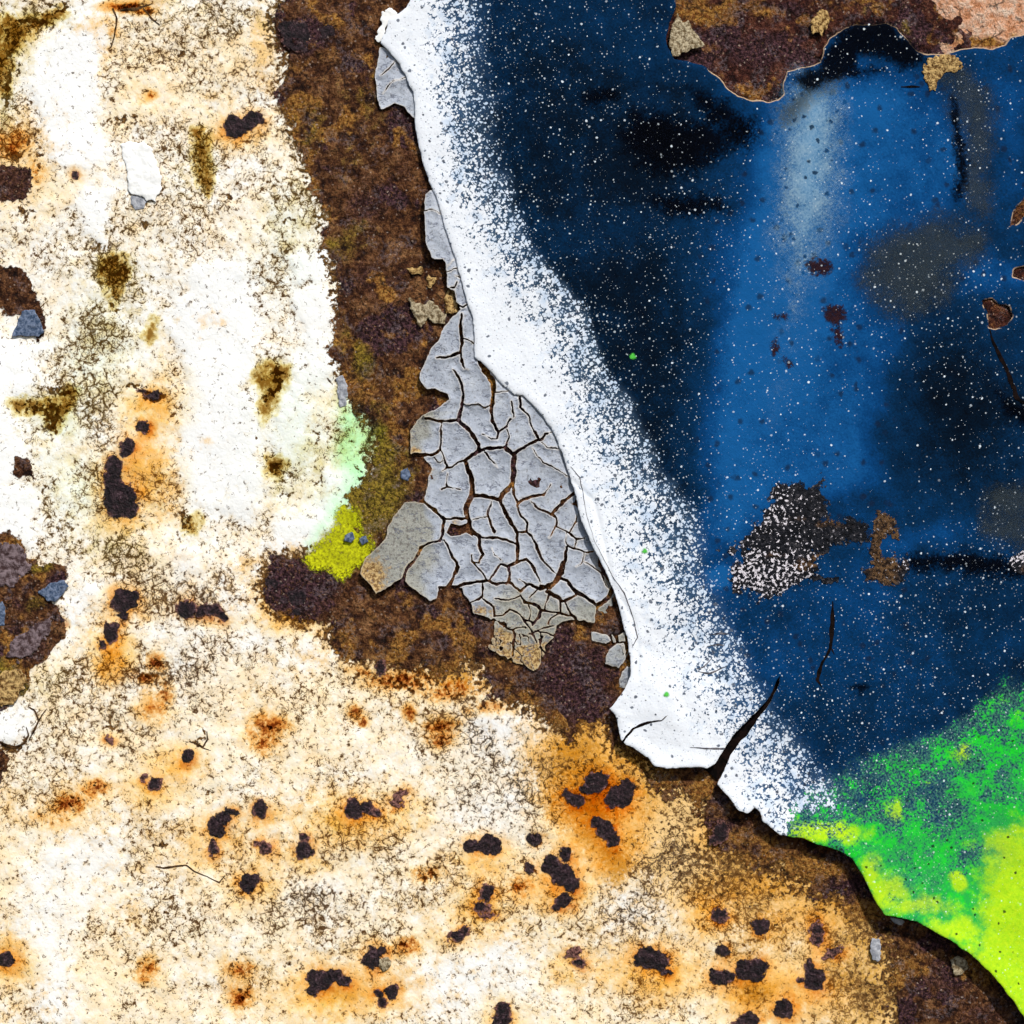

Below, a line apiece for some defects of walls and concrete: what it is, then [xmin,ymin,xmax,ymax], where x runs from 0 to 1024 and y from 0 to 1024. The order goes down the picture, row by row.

peeling [375,8,415,119]
peeling [669,13,704,57]
rust [103,420,151,519]
peeling [344,189,631,688]
crack [571,467,638,647]
rust [262,0,1024,1024]
spalling [716,472,910,605]
rust [0,529,71,711]
rust [97,588,140,651]
crack [816,601,835,687]
crack [690,678,779,780]
rust [207,798,268,858]